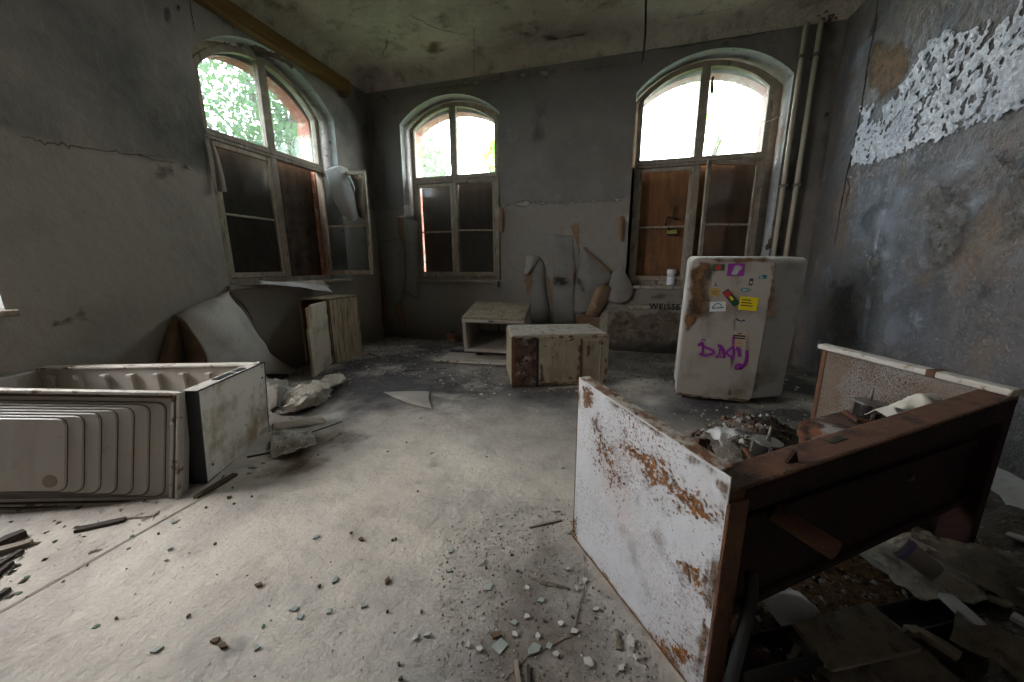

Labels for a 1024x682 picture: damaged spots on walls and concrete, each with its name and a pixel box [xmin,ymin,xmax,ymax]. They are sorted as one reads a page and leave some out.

peeling [851,0,1024,166]